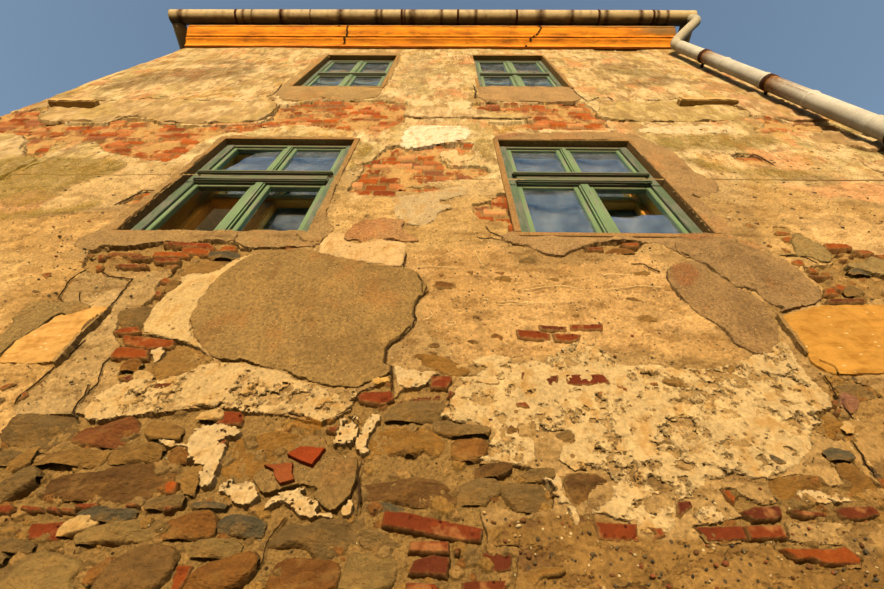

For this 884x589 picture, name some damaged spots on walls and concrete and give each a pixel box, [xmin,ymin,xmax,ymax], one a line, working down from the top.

flaking render [349,143,489,197]
flaking render [0,92,884,180]
crack [58,269,132,306]
flaking render [77,242,251,389]
crack [384,253,428,392]
flaking render [767,227,884,306]
crack [14,340,86,404]
crack [72,357,110,420]
flaking render [547,374,627,398]
flaking render [0,343,609,589]
flaking render [692,375,884,570]
flaking render [593,522,666,542]